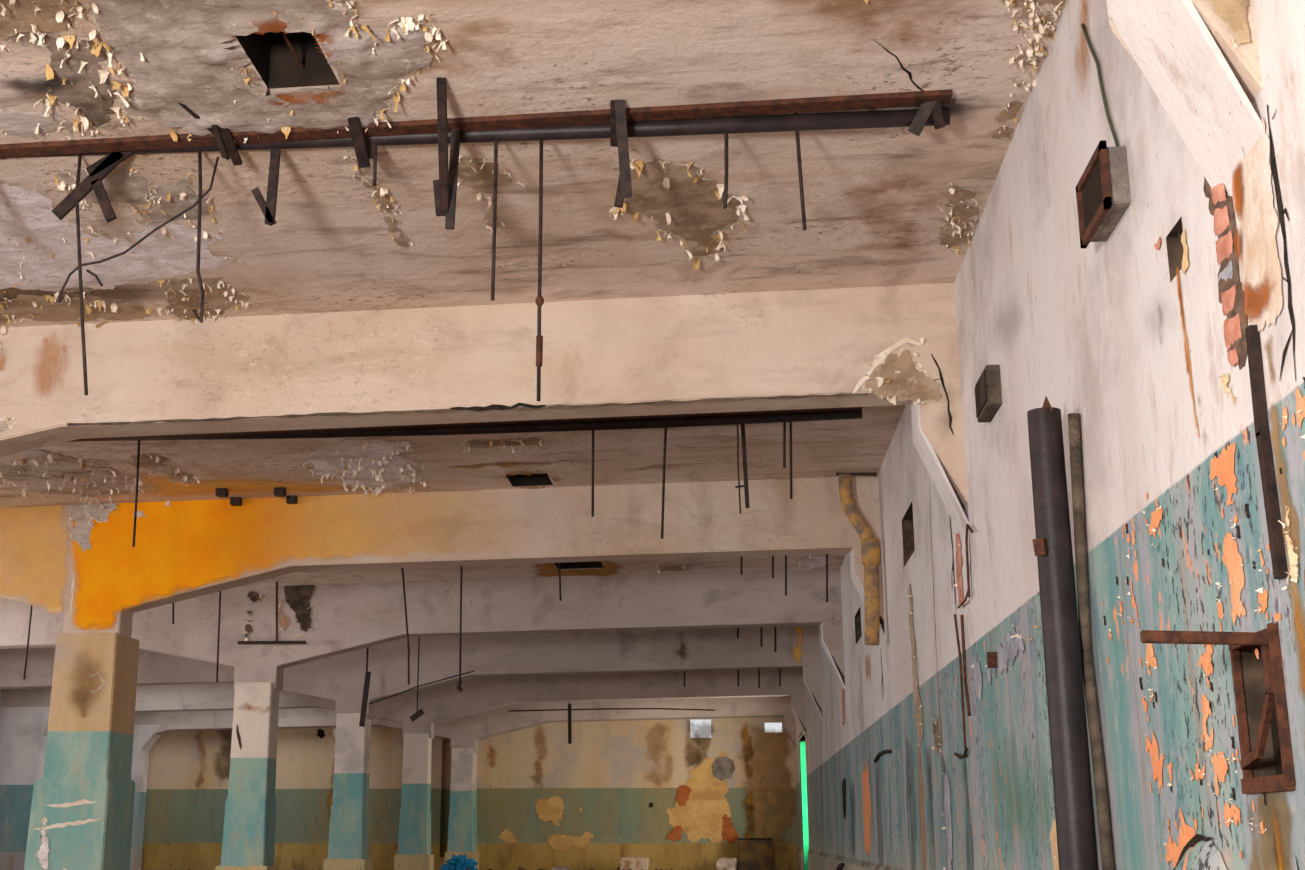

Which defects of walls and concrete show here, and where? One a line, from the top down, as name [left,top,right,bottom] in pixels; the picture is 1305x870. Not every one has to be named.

peeling [0,0,448,143]
peeling [989,0,1068,142]
peeling [0,161,250,355]
peeling [608,158,751,271]
spalling [1203,118,1283,404]
corrosion [1177,269,1199,437]
peeling [303,439,426,497]
damp [0,477,374,630]
damp [76,665,96,716]
peeling [1190,443,1305,834]
peeling [666,751,739,844]
damp [741,726,794,849]